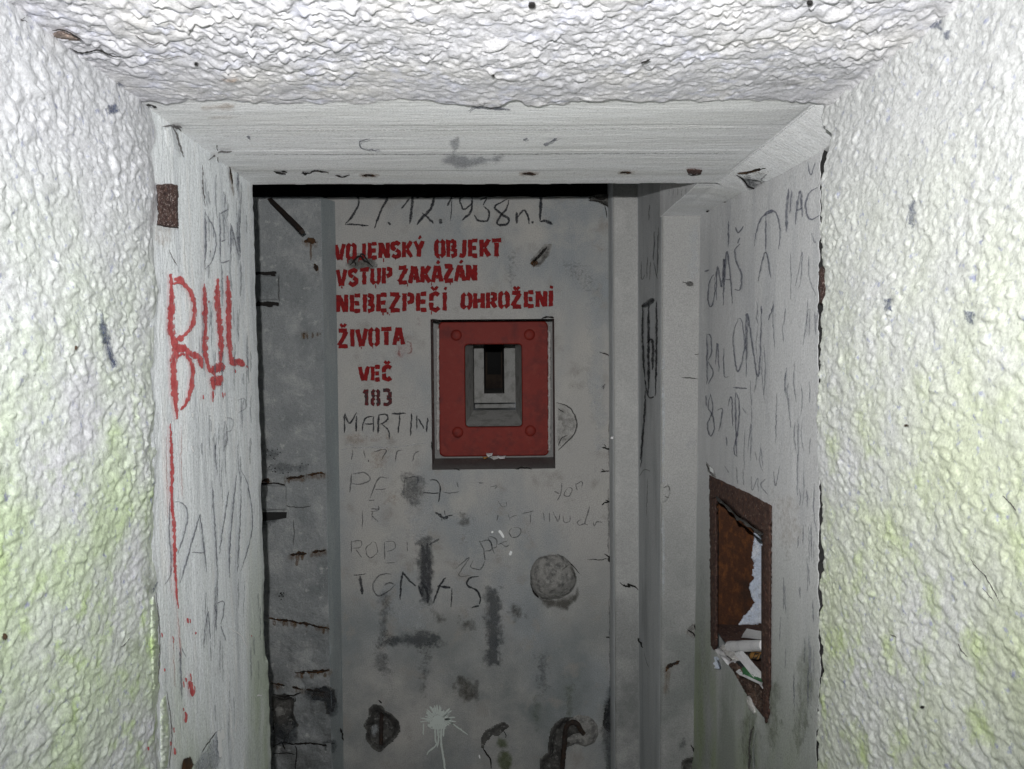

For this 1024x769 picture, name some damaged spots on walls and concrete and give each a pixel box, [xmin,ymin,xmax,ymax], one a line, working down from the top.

spalling [736,168,767,189]
rust [268,617,330,634]
spalling [308,686,337,715]
spalling [272,693,299,745]